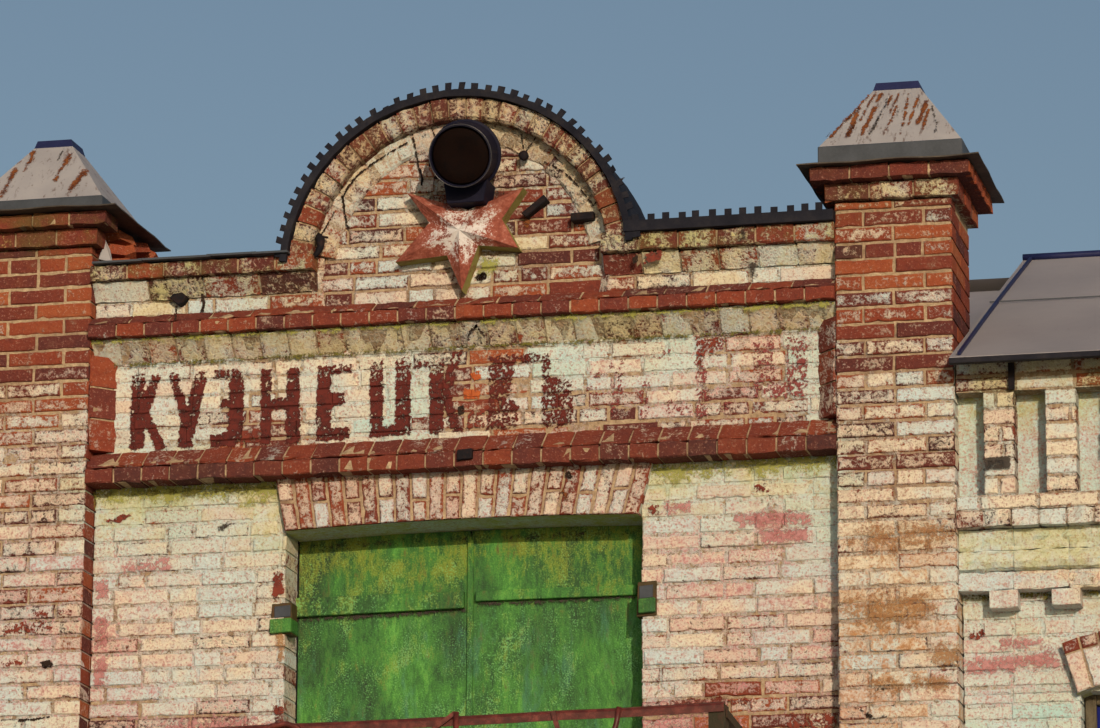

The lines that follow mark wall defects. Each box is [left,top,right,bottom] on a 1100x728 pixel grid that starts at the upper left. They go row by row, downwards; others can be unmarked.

rust [827,92,938,138]
rust [0,151,35,197]
rust [68,169,89,190]
crack [321,127,436,234]
spalling [474,257,500,282]
peeling [696,337,724,372]
peeling [645,692,757,728]
peeling [778,710,839,728]